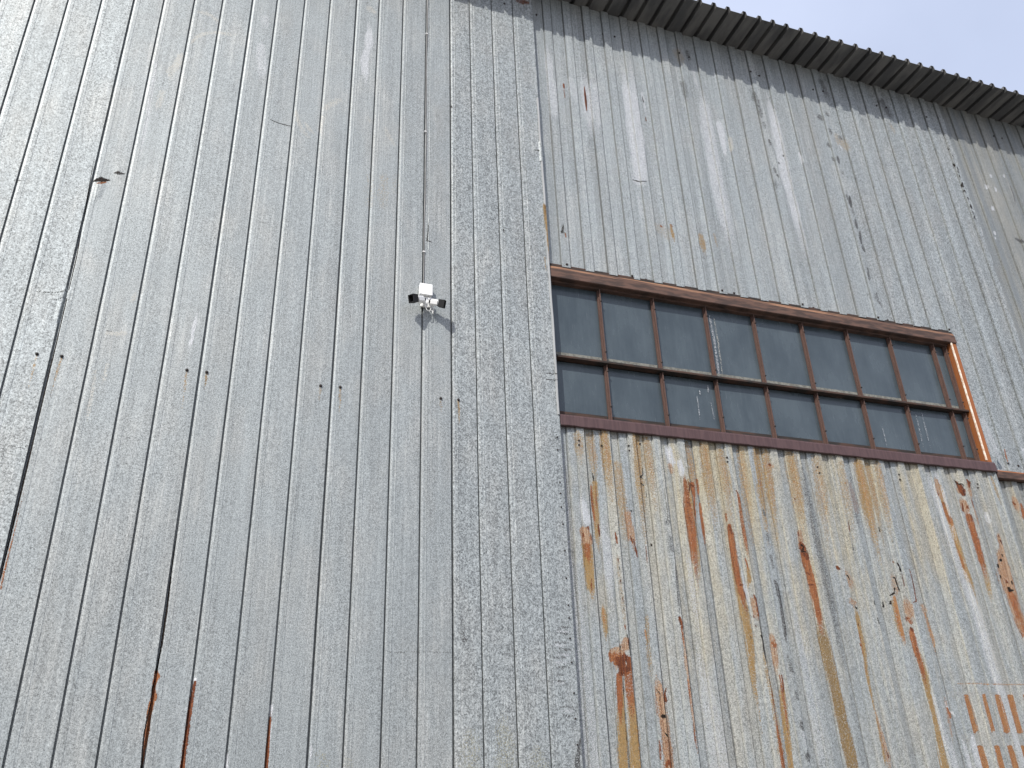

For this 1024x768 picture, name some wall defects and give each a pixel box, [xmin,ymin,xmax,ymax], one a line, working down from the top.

rust [140,670,160,768]
rust [180,677,197,768]
rust [573,430,893,768]
rust [890,475,1024,768]